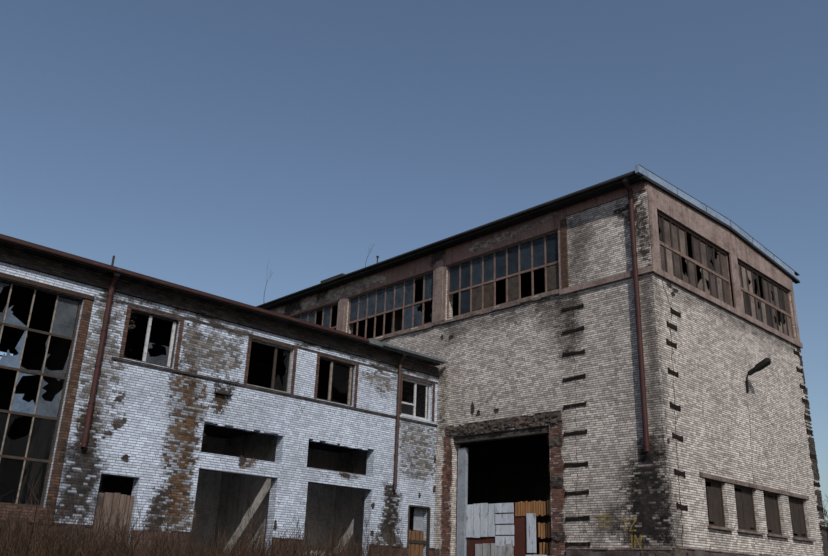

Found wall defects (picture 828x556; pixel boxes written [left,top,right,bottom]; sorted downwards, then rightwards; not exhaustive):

peeling [74,288,254,451]
leakage [611,429,676,549]